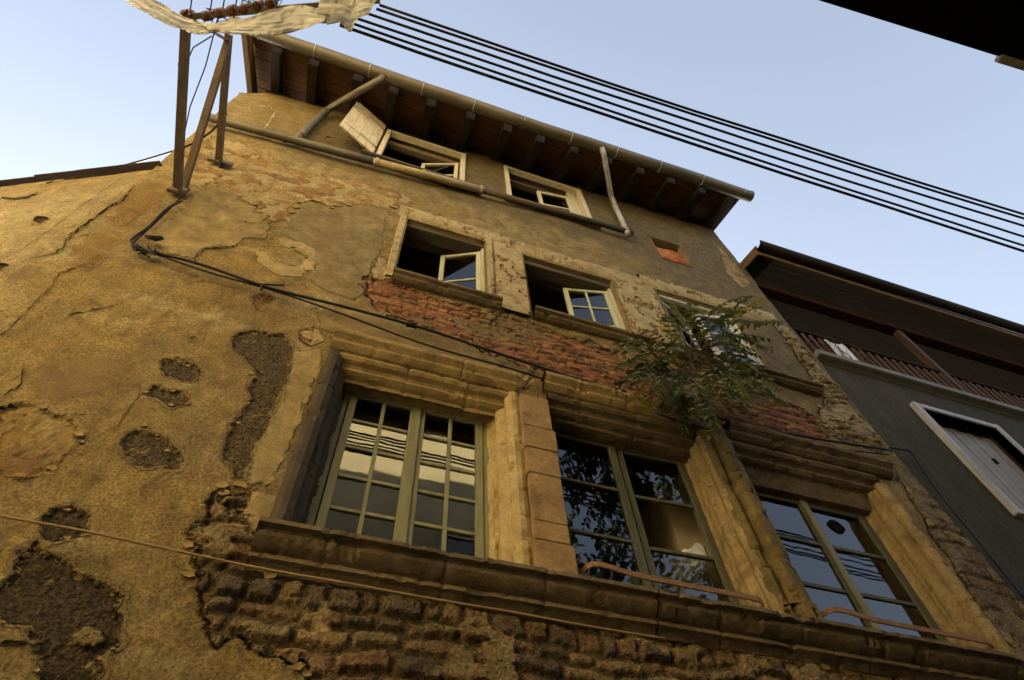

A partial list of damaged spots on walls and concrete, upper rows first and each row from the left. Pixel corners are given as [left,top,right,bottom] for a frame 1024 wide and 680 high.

crack [0,173,142,335]
flaking render [183,135,412,222]
flaking render [114,424,189,473]
flaking render [142,354,205,409]
flaking render [243,491,277,531]
flaking render [219,326,323,481]
flaking render [362,257,831,445]
flaking render [0,501,131,680]